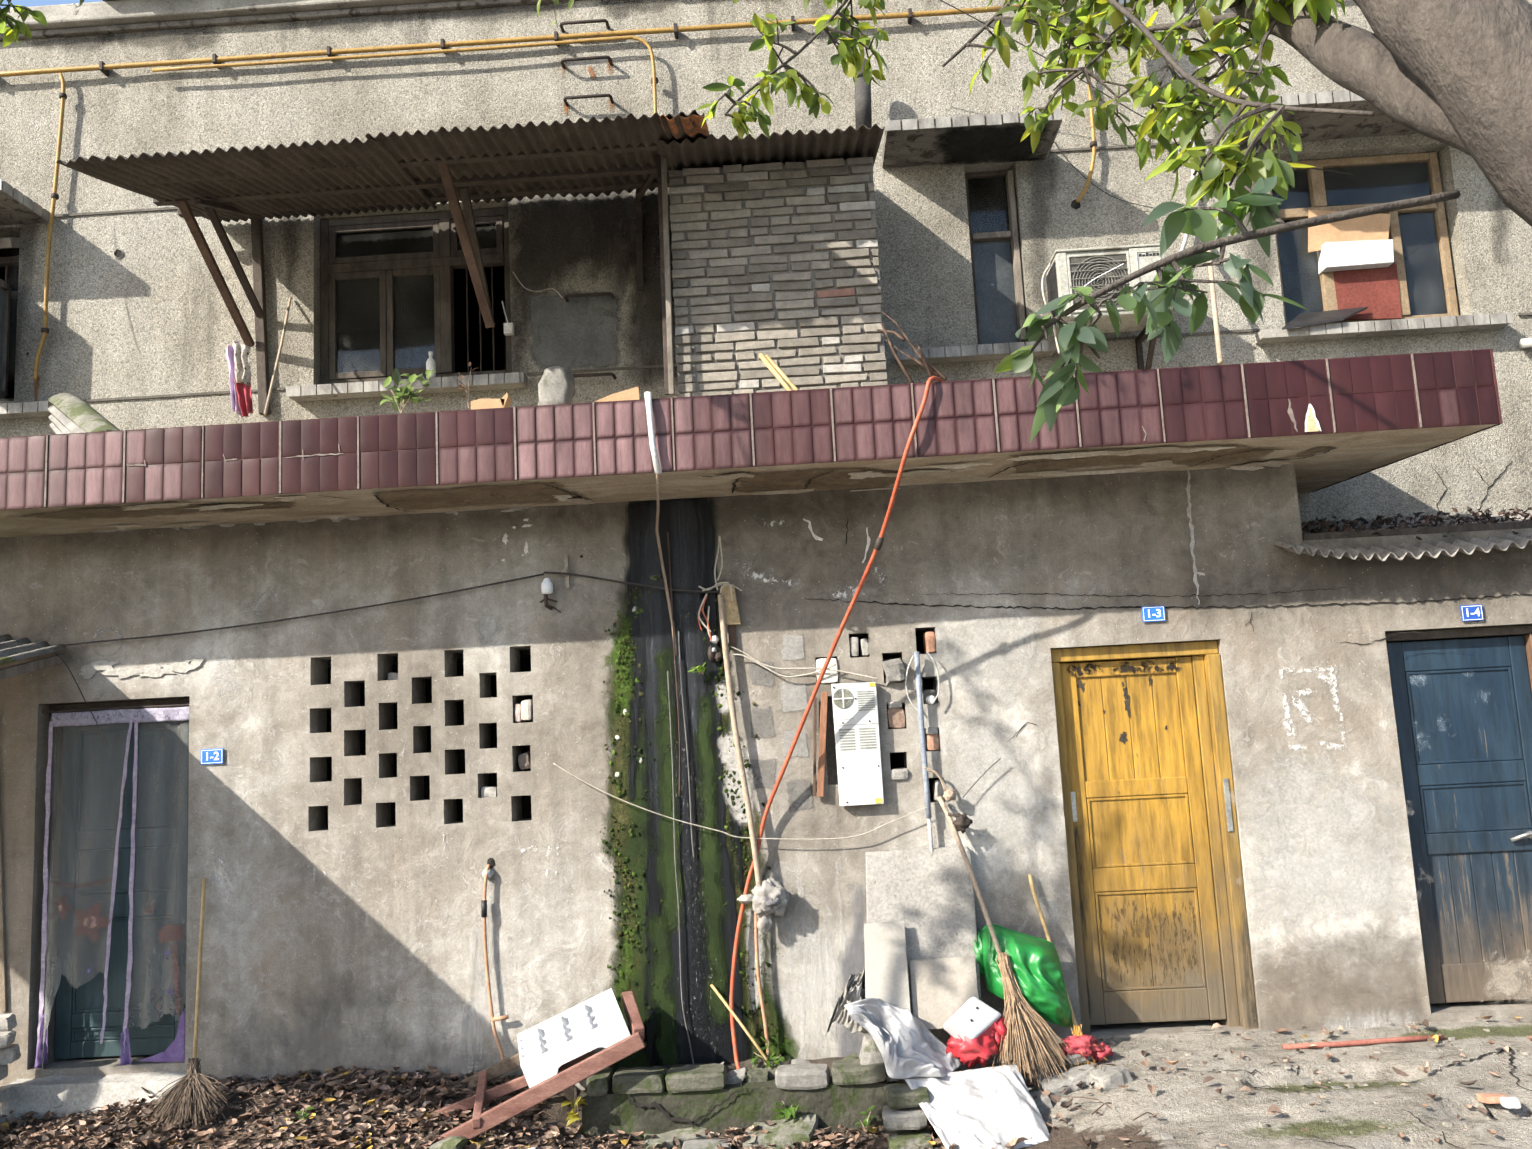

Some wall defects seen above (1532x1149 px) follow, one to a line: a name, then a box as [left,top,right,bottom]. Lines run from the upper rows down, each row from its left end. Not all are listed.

crack [808,470,1532,645]
crack [1431,461,1512,515]
water stain [600,497,865,1074]